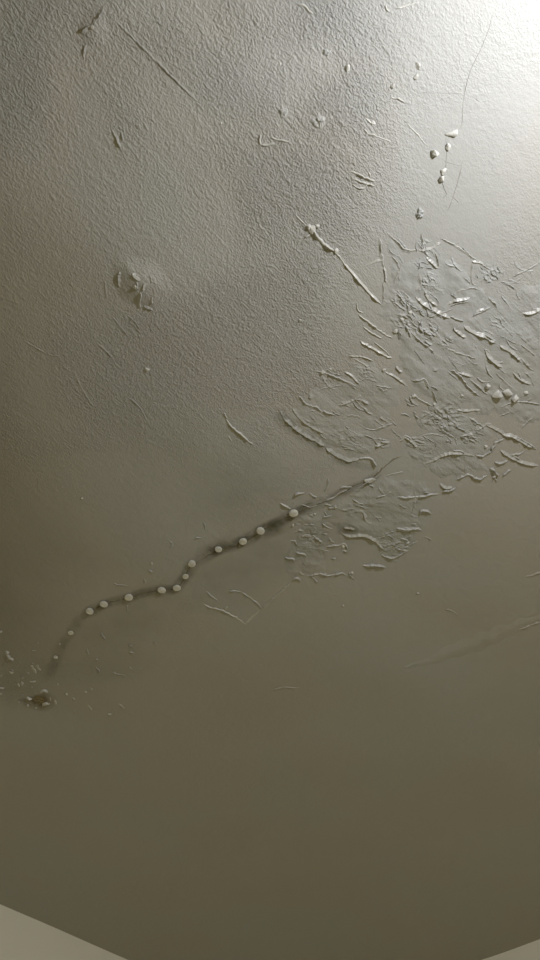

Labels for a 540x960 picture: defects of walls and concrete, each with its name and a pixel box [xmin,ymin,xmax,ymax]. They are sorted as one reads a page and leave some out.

crack [93,456,402,610]
flaking render [203,232,540,625]